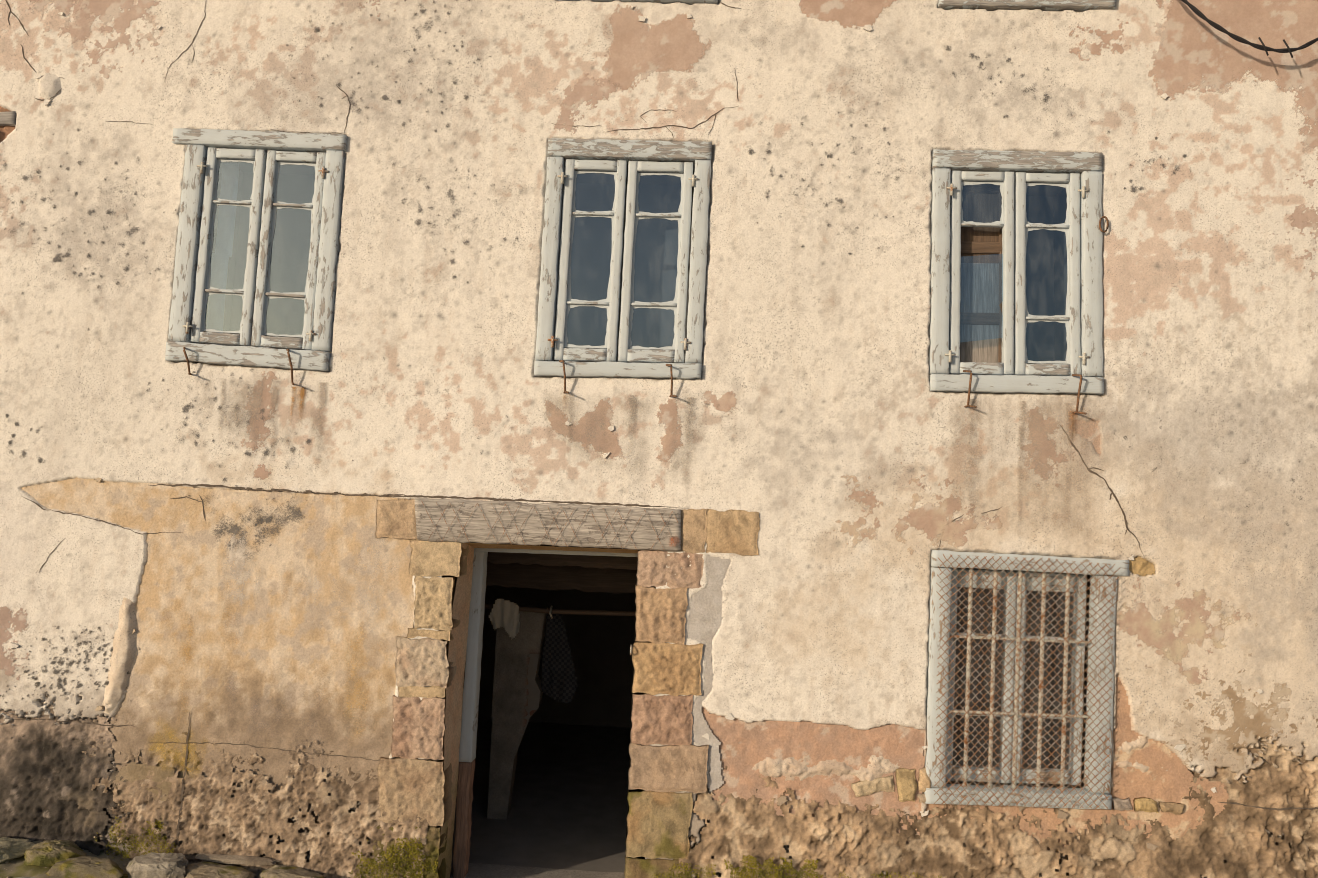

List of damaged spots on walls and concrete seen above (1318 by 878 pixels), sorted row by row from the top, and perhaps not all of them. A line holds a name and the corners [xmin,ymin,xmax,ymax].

crack [166,3,206,75]
peeling [554,4,712,133]
peeling [799,0,897,32]
peeling [1148,0,1318,281]
crack [1057,421,1145,558]
water stain [0,626,114,742]
peeling [0,371,428,878]
spalling [674,555,1318,878]